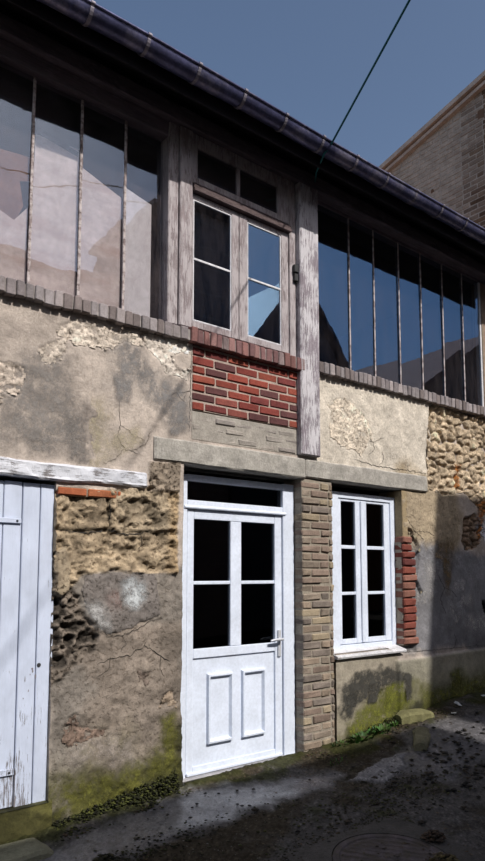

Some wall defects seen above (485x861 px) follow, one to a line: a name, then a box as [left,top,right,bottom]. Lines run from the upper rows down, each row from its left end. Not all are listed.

flaking render [38,318,191,381]
flaking render [0,362,26,403]
flaking render [426,405,485,550]
crack [97,618,169,676]
water stain [340,664,412,717]